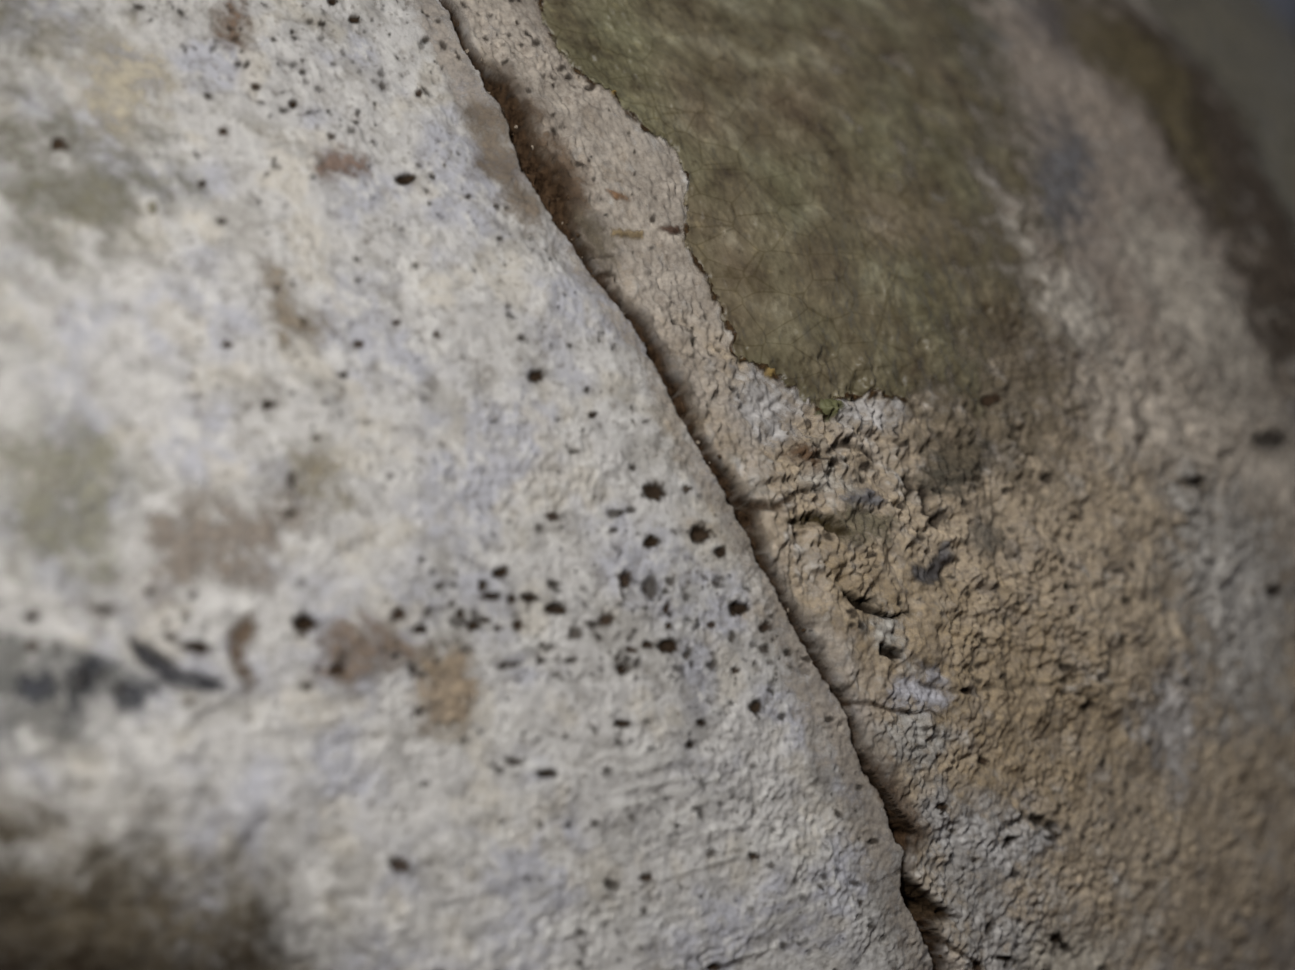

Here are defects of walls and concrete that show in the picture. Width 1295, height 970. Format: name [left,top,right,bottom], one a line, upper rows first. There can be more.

spalling [395,173,416,185]
peeling [455,0,907,451]
spalling [641,482,666,501]
crack [440,0,974,970]
spalling [643,534,661,548]
spalling [686,521,726,558]
spalling [478,565,615,639]
spalling [615,571,679,675]
spalling [728,601,749,642]
spalling [842,592,900,620]
spalling [879,644,901,660]
spalling [748,699,761,715]